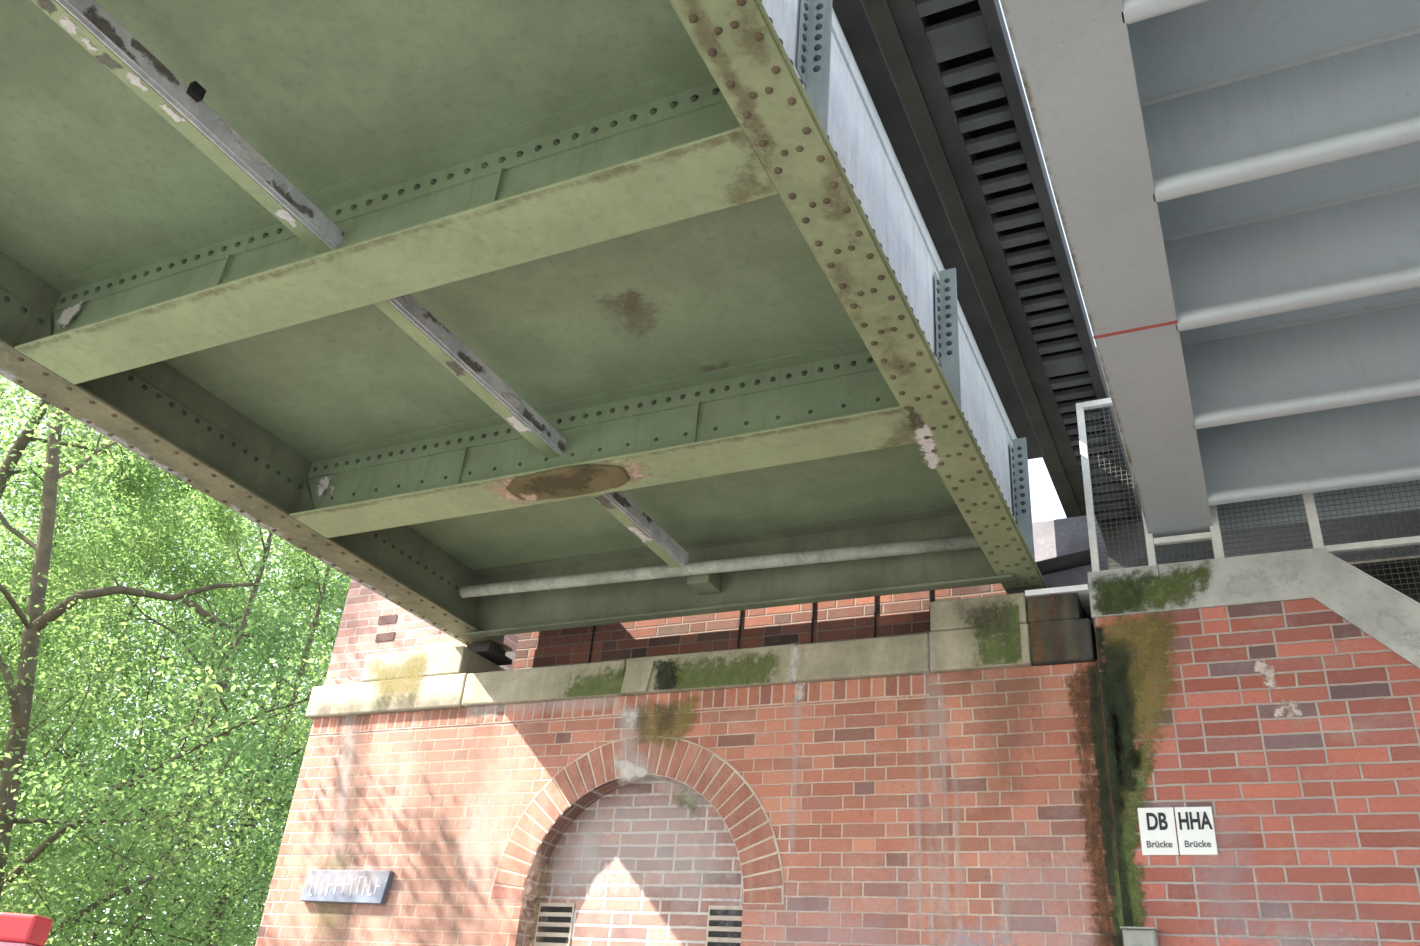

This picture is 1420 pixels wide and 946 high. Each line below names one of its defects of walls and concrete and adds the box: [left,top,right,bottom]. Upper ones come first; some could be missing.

peeling [38,0,180,92]
peeling [159,104,186,123]
peeling [446,351,485,376]
peeling [506,408,565,451]
peeling [904,406,942,469]
rust [483,460,648,504]
water stain [654,660,676,690]